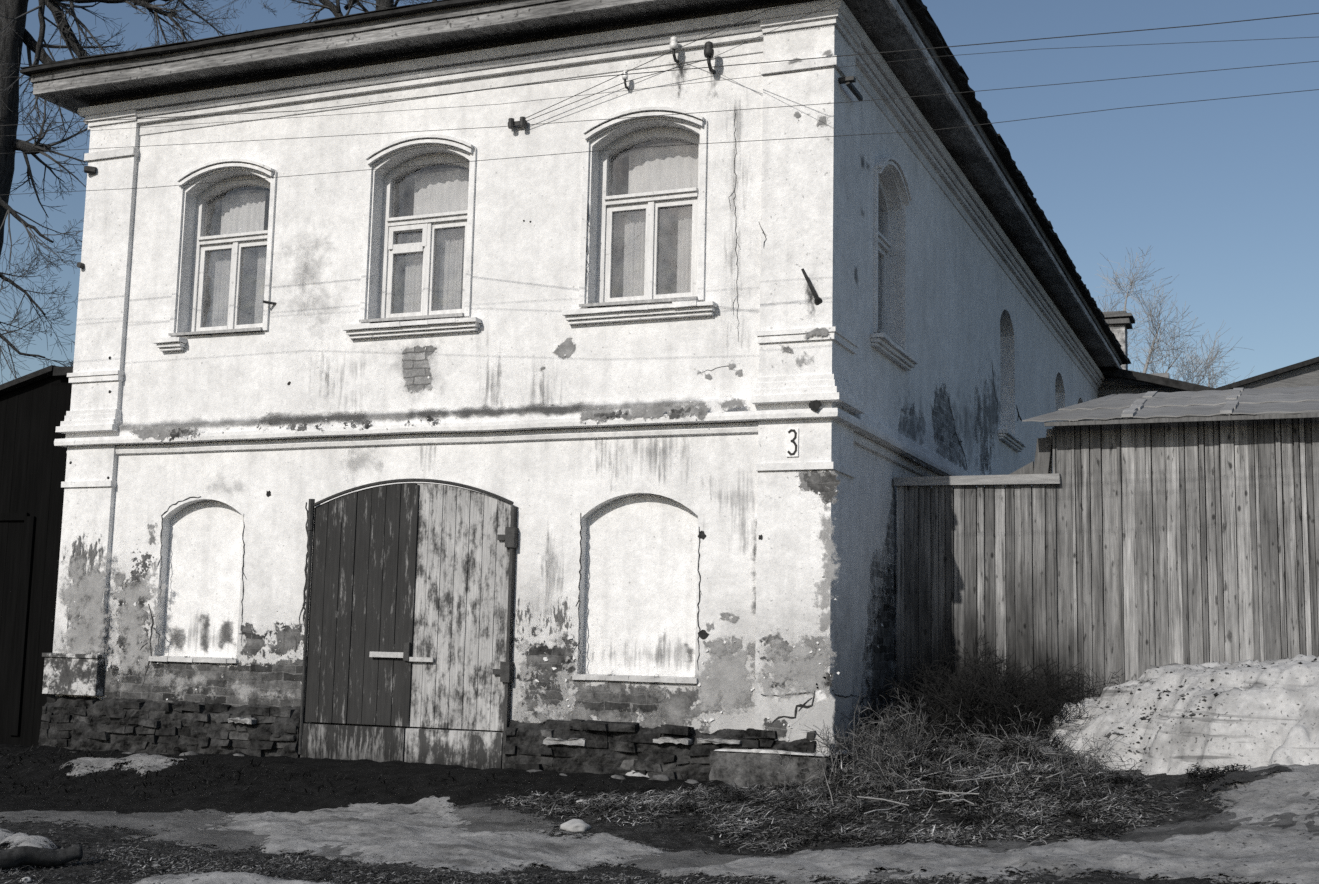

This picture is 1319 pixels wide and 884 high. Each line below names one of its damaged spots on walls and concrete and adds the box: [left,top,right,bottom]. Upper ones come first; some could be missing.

crack [728,107,766,329]
water stain [119,400,701,429]
flaking render [401,345,437,393]
spalling [553,338,576,359]
flaking render [899,379,1001,477]
flaking render [54,523,307,708]
flaking render [513,469,841,741]
crack [761,678,861,723]